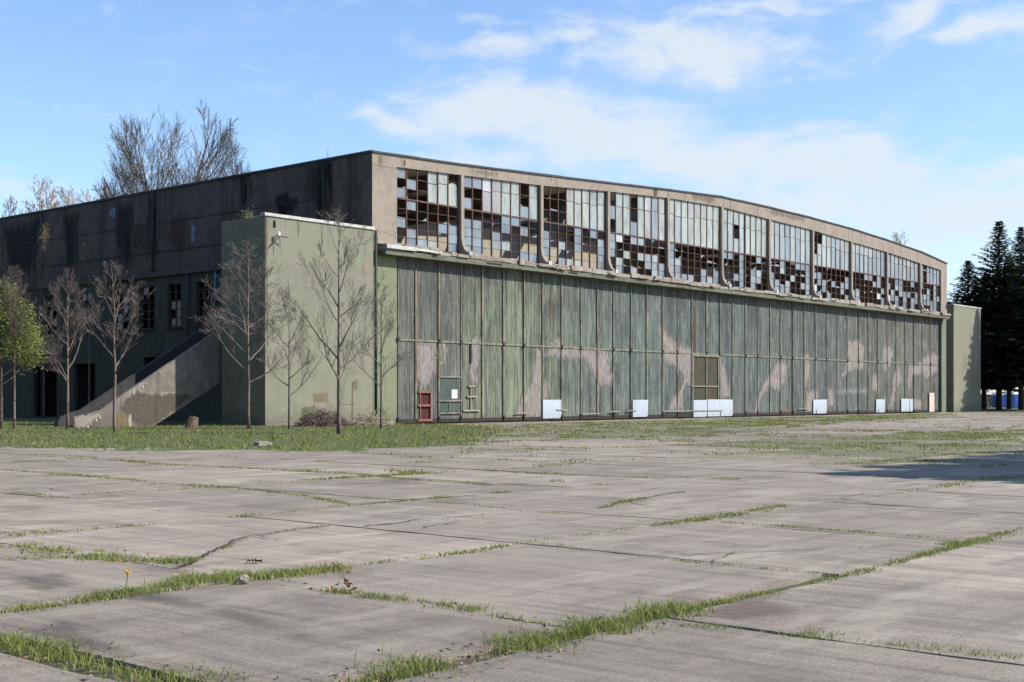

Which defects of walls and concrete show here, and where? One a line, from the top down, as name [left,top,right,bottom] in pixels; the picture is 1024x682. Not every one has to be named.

damp [5,218,39,276]
peeling [414,336,448,391]
peeling [514,337,613,421]
peeling [659,325,691,414]
peeling [755,359,789,413]
peeling [803,337,939,412]